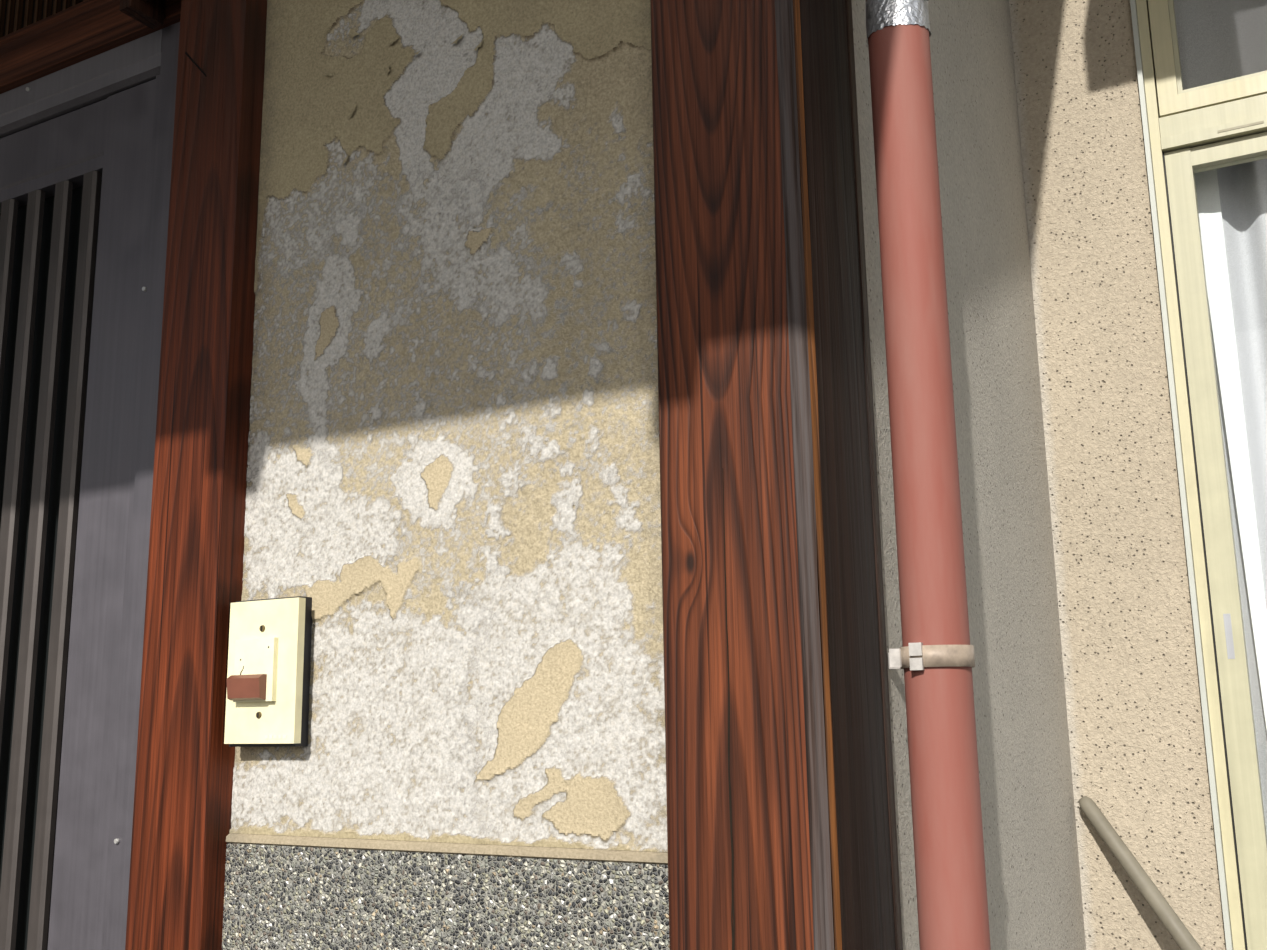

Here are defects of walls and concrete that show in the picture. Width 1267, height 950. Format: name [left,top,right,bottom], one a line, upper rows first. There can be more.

flaking render [230,0,668,852]